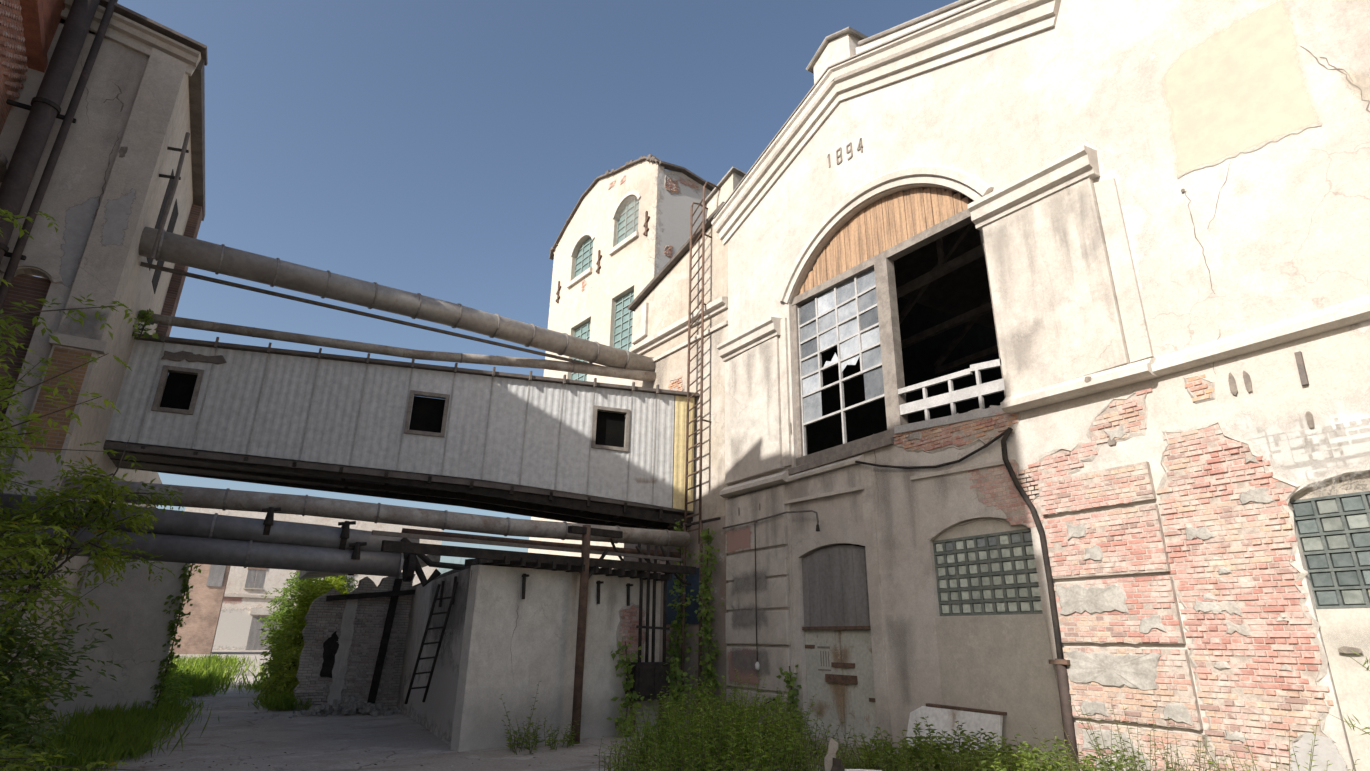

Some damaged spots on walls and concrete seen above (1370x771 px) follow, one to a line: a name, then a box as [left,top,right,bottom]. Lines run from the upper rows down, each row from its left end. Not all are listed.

crack [1301,46,1370,112]
flaking render [59,197,99,287]
crack [1185,161,1231,294]
flaking render [1184,370,1252,404]
flaking render [893,405,1022,454]
flaking render [968,388,1362,771]
flaking render [616,603,646,662]